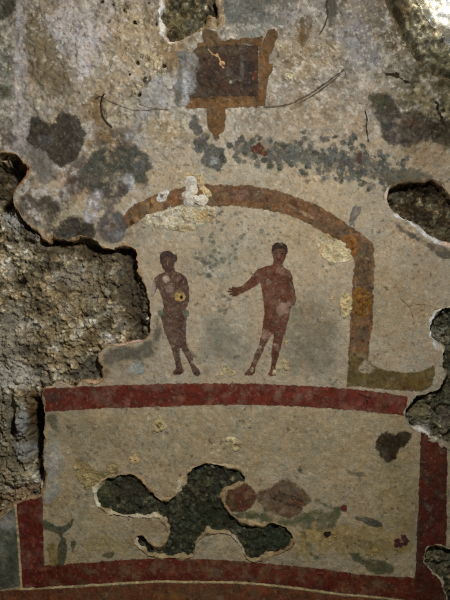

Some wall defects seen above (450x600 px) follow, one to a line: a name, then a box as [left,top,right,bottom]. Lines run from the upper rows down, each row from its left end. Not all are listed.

flaking render [148,0,225,44]
peeling [128,48,166,97]
damp [15,106,56,182]
damp [37,72,168,242]
damp [369,93,450,148]
flaking render [383,178,450,248]
flaking render [0,151,152,517]
flaking render [403,306,450,451]
flaking render [73,458,296,563]
flaking render [423,544,450,600]